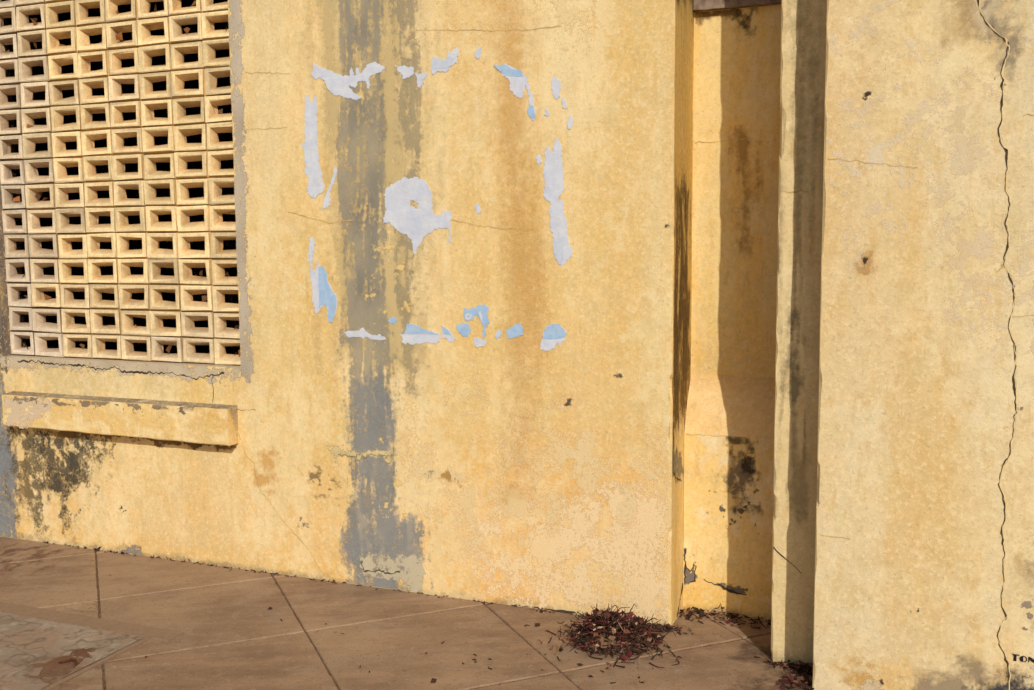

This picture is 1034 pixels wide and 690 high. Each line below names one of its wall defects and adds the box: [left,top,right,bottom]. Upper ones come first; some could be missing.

leakage [0,375,116,538]
leakage [336,0,691,624]
leakage [707,436,763,534]
crack [977,0,1034,690]